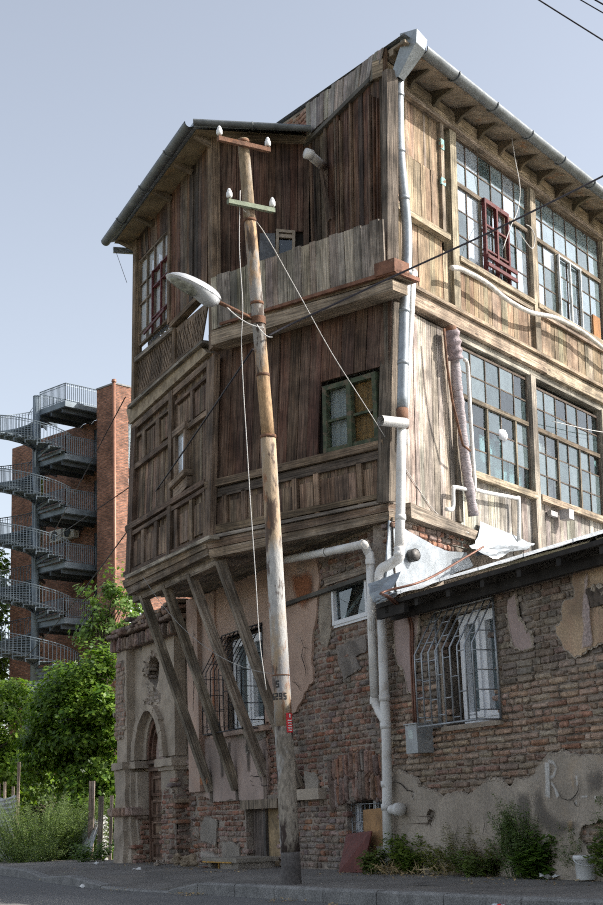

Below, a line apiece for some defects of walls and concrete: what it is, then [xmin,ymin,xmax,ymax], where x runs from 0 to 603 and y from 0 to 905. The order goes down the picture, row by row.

spalling [113,660,126,741]
spalling [142,650,161,705]
flaking render [392,614,421,694]
flaking render [505,589,535,652]
flaking render [555,566,603,658]
spalling [129,745,200,864]
flaking render [386,748,603,881]